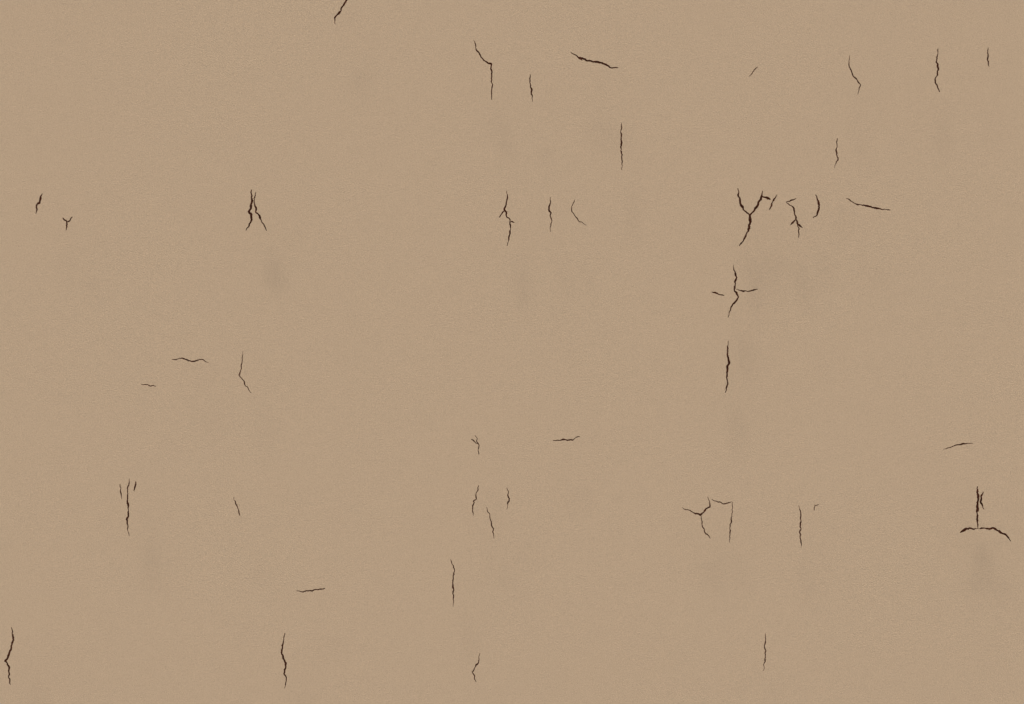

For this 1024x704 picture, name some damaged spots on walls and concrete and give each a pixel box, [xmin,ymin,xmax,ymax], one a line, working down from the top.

crack [474,41,493,100]
crack [571,52,618,69]
crack [933,49,941,92]
crack [246,189,267,231]
crack [499,191,515,245]
crack [846,198,889,210]
crack [712,188,820,393]
crack [120,481,136,534]
crack [682,498,733,543]
crack [960,486,1011,541]
crack [4,627,14,685]
crack [280,633,288,688]